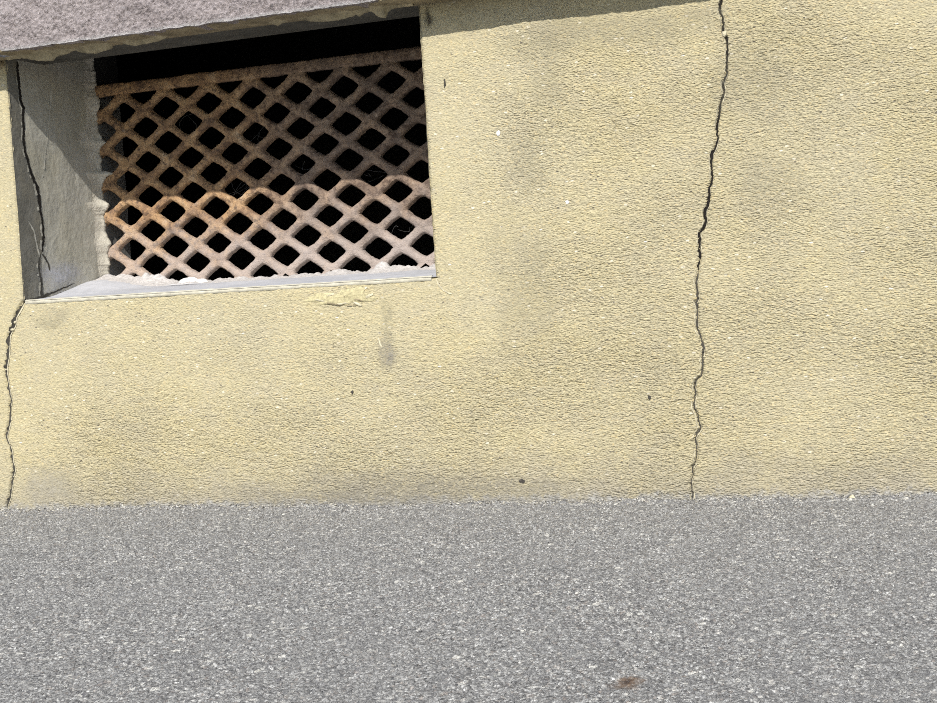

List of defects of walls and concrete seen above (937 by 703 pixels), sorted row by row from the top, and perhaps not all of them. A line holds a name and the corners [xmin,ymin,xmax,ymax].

crack [3,61,75,509]
crack [688,0,730,500]